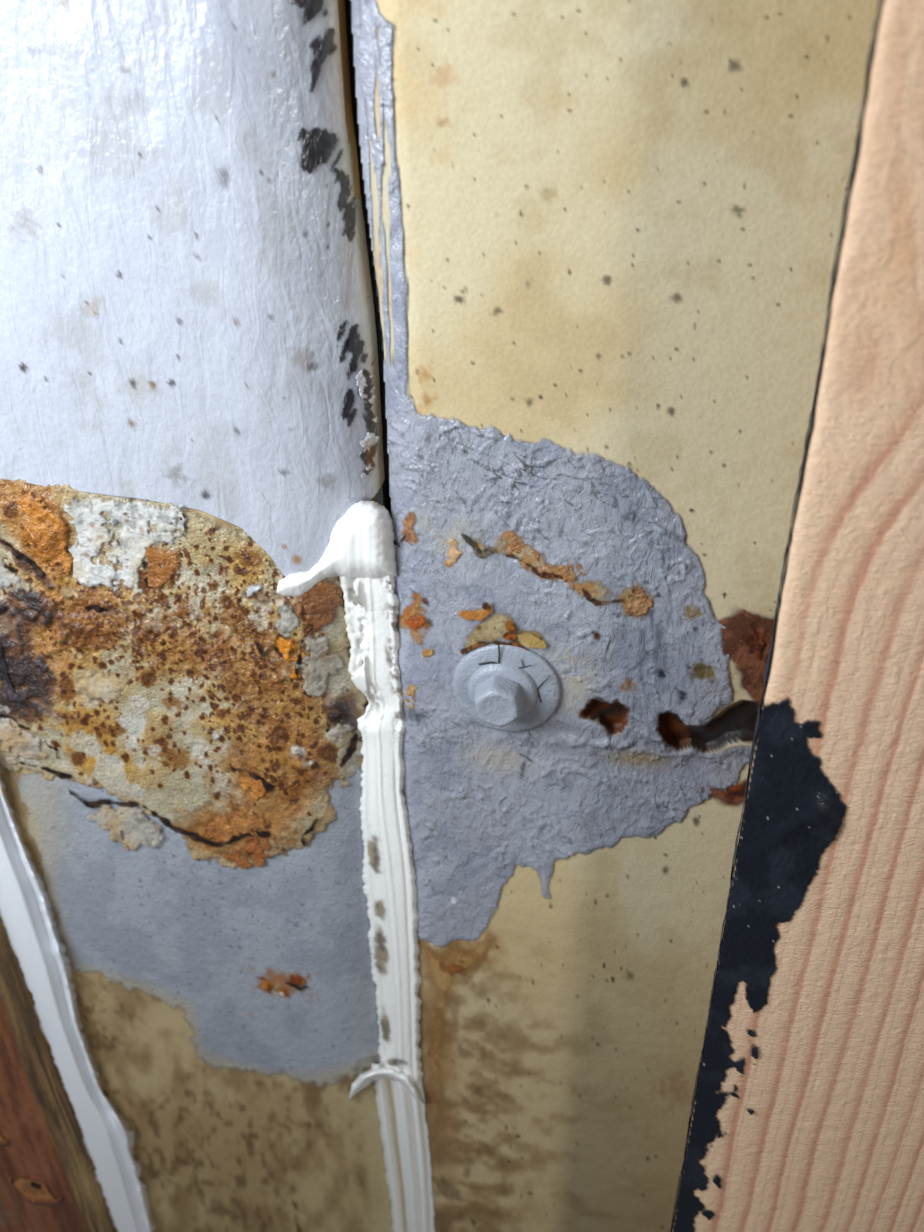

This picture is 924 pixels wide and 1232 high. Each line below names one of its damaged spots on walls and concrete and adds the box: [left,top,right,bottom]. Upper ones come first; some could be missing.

peeling [356,369,379,479]
rust [394,512,418,547]
rust [445,538,462,567]
peeling [461,531,653,618]
rust [399,593,434,657]
peeling [459,602,546,654]
rust [0,479,367,869]
rust [401,684,418,709]
rust [719,611,774,706]
rust [704,780,747,806]
rust [258,970,309,997]